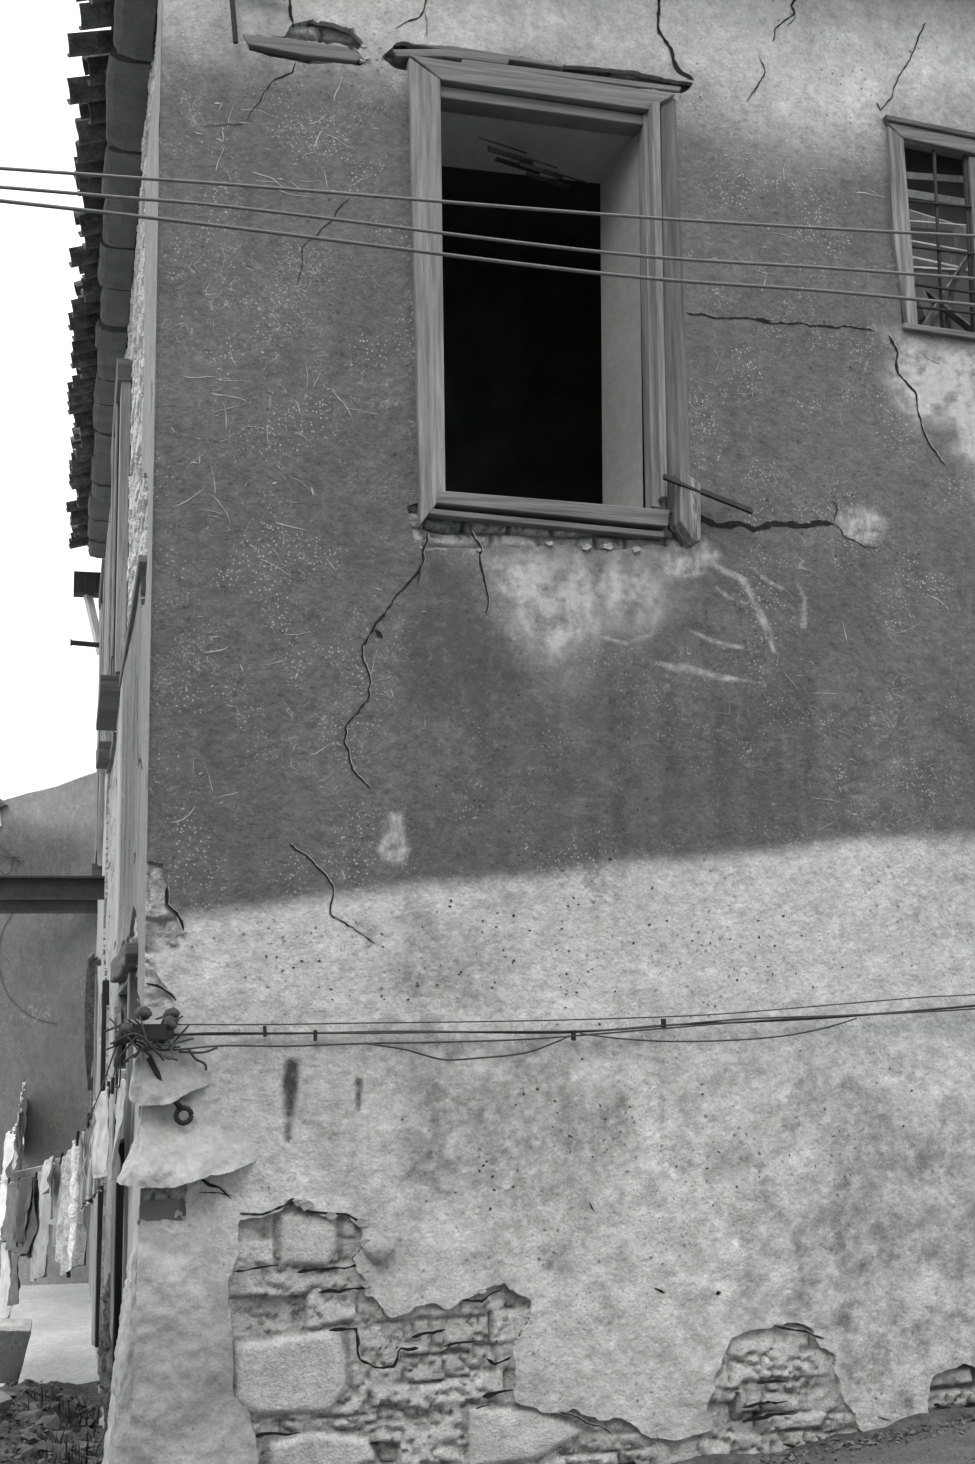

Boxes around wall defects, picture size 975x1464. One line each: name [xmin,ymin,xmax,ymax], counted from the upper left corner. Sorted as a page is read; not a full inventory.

flaking render [250,18,407,70]
flaking render [561,69,690,93]
crack [657,0,694,80]
crack [746,0,796,102]
flaking render [124,0,160,634]
crack [686,312,945,465]
crack [701,502,877,548]
crack [343,533,429,788]
leakage [414,543,748,720]
crack [289,844,376,944]
flaking render [228,1198,962,1464]
flaking render [928,1364,975,1413]